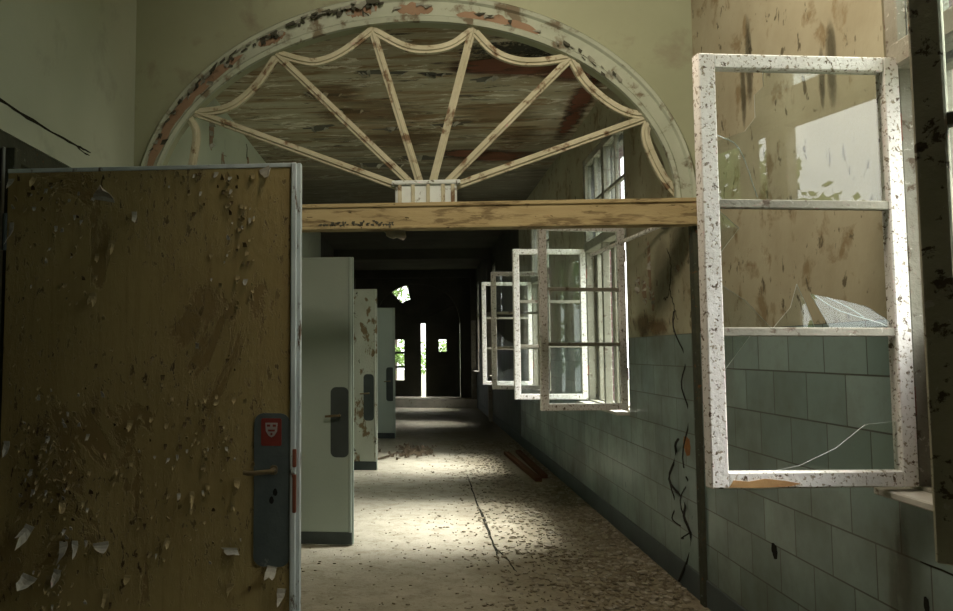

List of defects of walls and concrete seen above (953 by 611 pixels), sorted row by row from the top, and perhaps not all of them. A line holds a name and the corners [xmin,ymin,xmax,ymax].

crack [0,98,91,156]
flaking render [140,0,433,182]
peeling [357,155,447,169]
peeling [354,70,452,79]
peeling [556,40,622,83]
peeling [168,123,271,329]
peeling [2,386,109,611]
peeling [153,419,240,515]
crack [467,475,517,572]